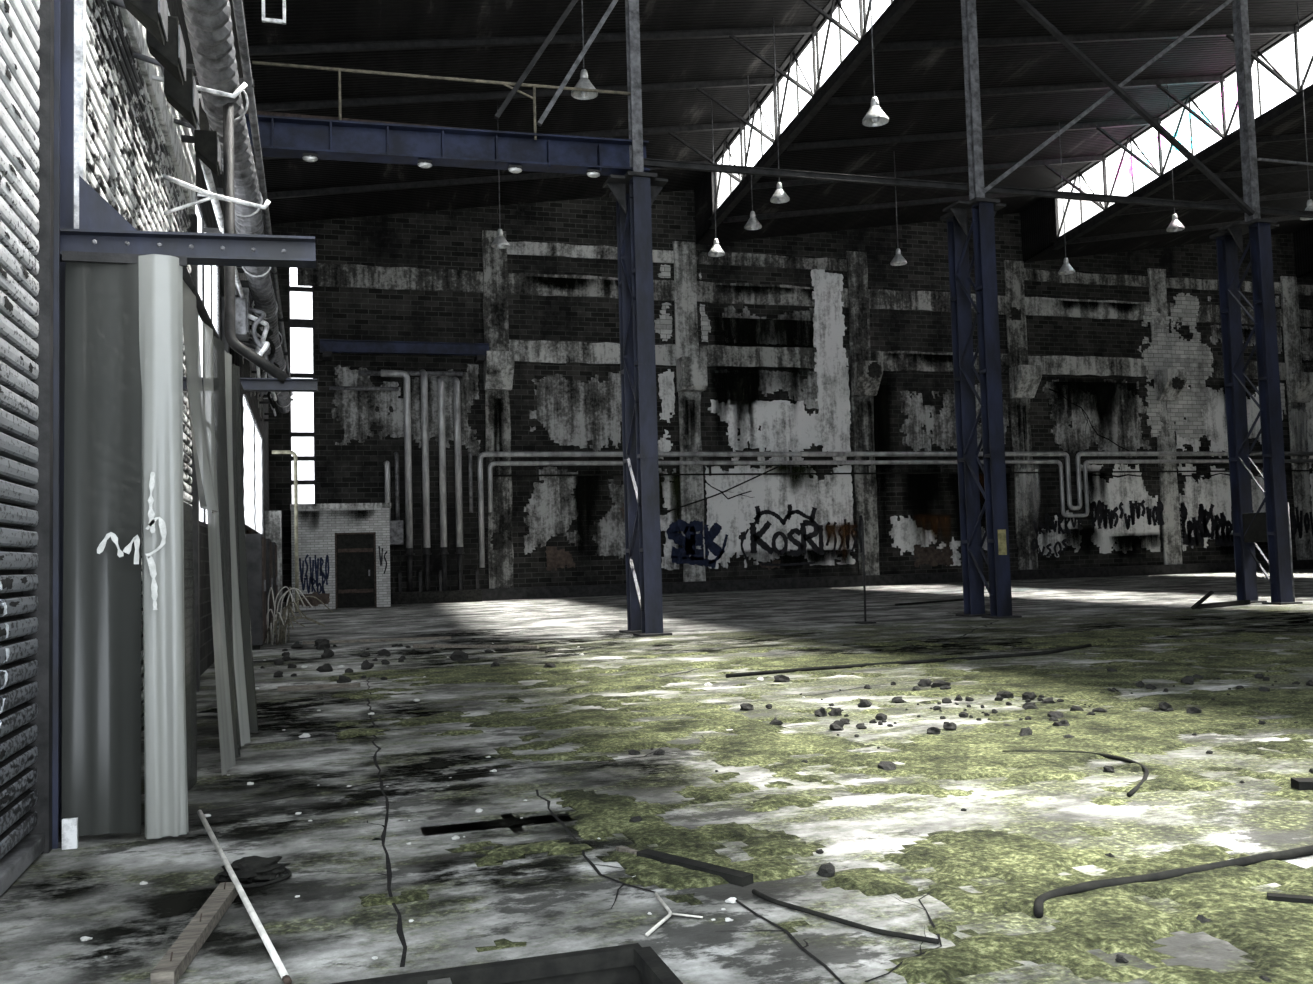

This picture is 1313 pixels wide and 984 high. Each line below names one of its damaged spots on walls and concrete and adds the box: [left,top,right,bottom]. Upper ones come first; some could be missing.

peeling [658,265,671,278]
peeling [654,302,672,341]
flaking render [529,371,622,452]
flaking render [700,269,856,569]
peeling [1038,293,1233,557]
flaking render [1246,387,1262,444]
flaking render [491,466,626,571]
flaking render [889,515,961,567]
flaking render [1251,468,1266,513]
peeling [0,577,28,637]
crack [189,677,715,967]
crack [715,893,942,984]